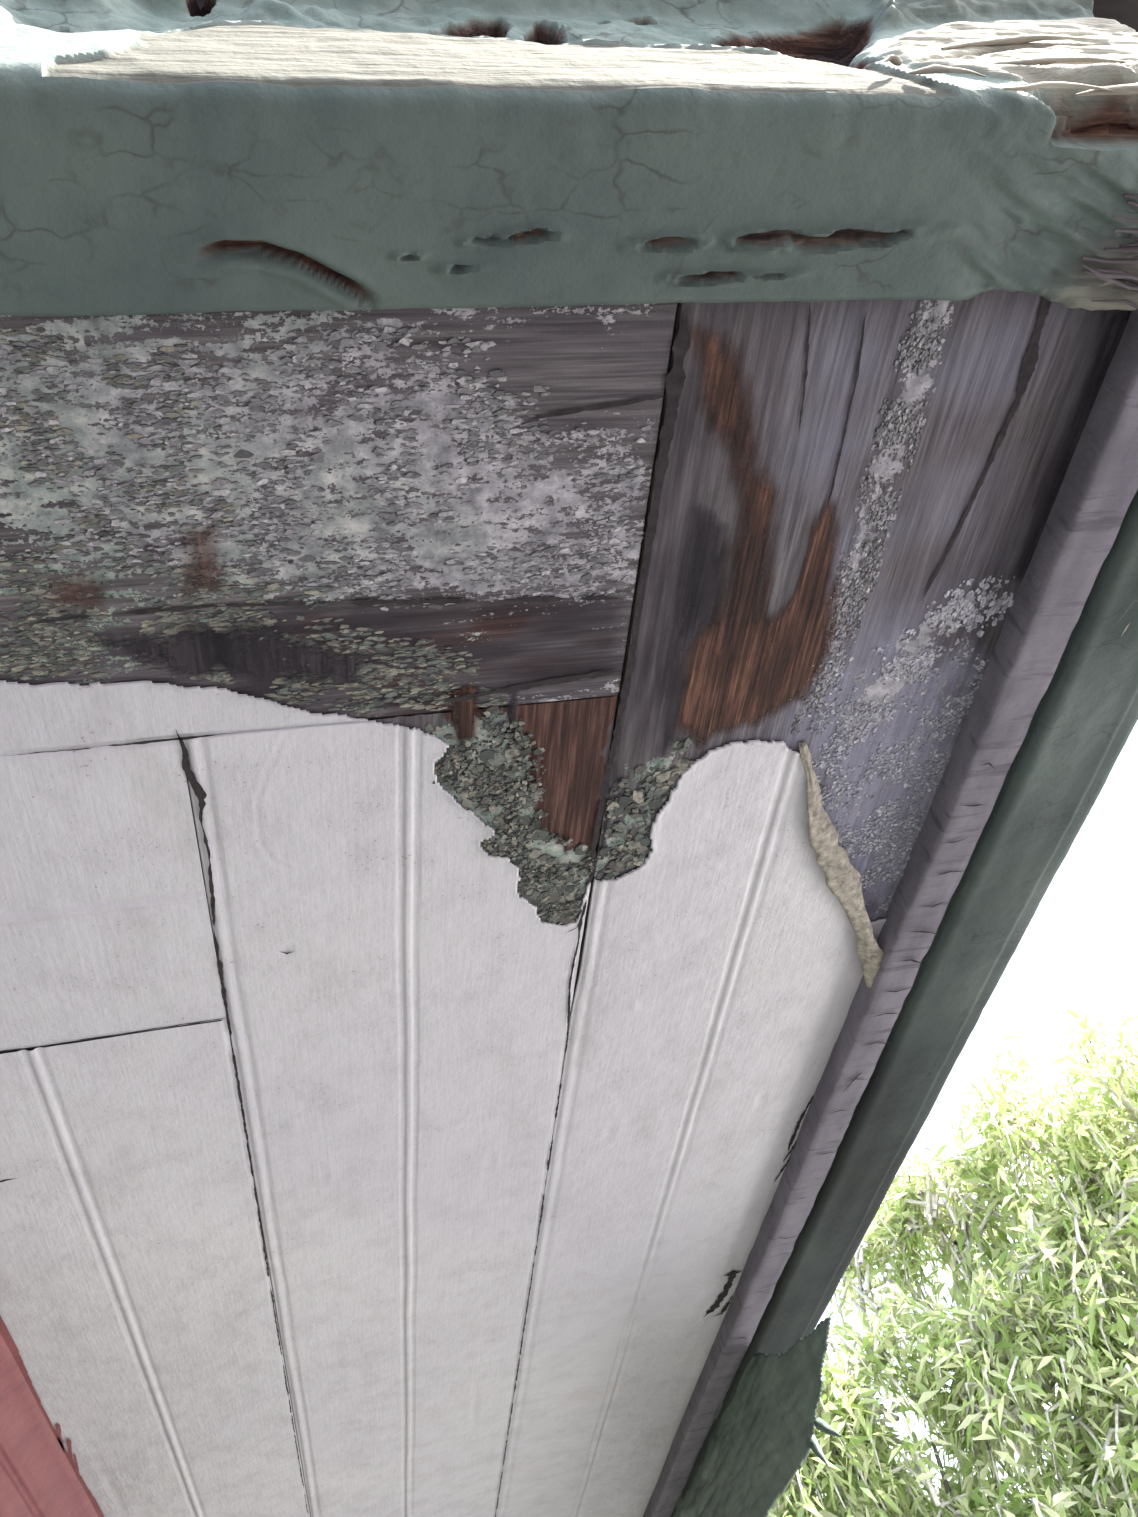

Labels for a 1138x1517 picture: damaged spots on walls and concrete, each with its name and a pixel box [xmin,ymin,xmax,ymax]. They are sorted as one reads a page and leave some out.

peeling [42,13,962,97]
crack [1,601,309,627]
leakage [101,627,362,684]
peeling [0,289,1123,988]
leakage [450,686,477,741]
leakage [508,692,517,748]
crack [352,318,690,1517]
crack [3,731,308,1512]
peeling [673,1317,841,1517]